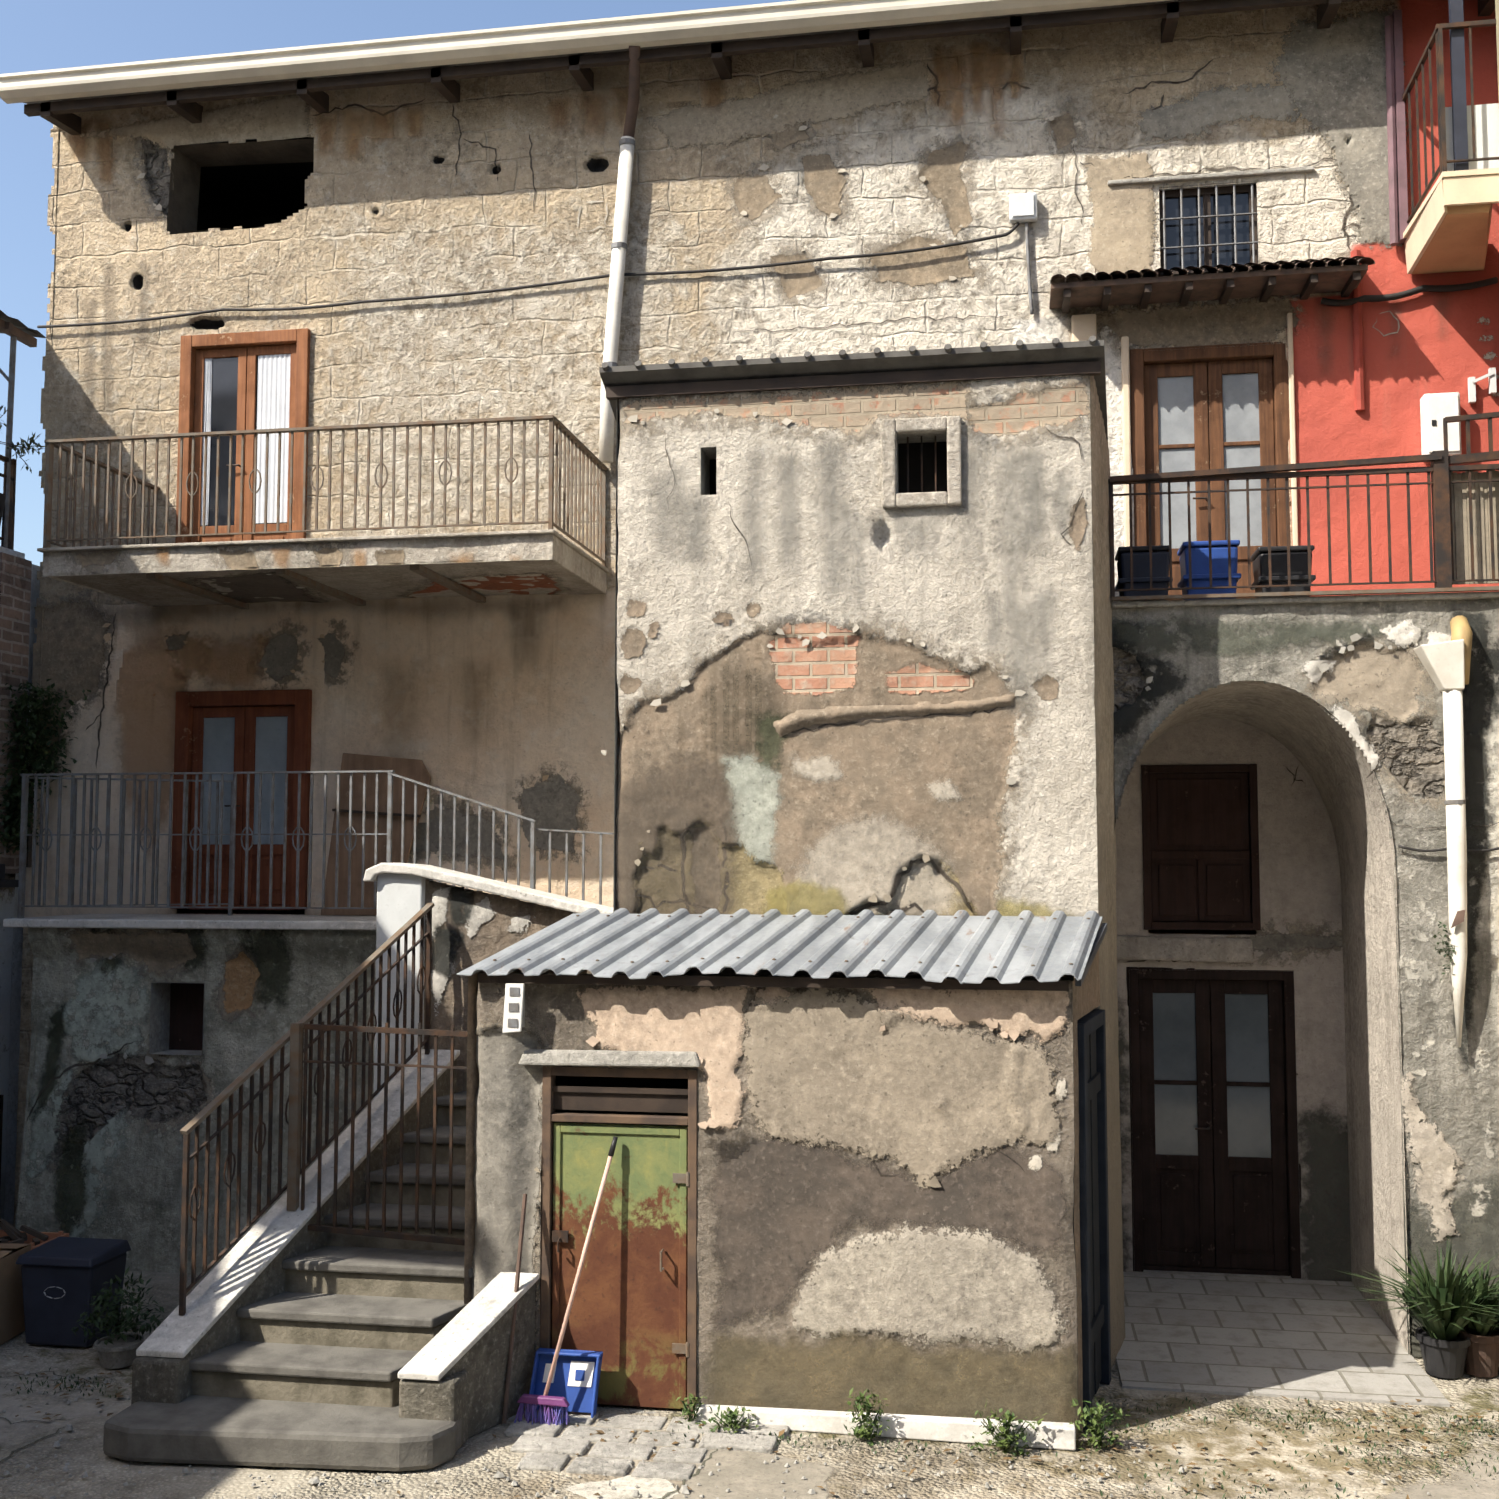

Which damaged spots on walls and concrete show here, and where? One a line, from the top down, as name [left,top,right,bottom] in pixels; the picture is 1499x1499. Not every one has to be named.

crack [1126,59,1213,110]
crack [313,99,536,208]
peeling [765,242,827,304]
peeling [858,135,986,298]
crack [1073,145,1336,223]
crack [1341,194,1360,249]
water stain [1112,617,1379,737]
peeling [601,600,1059,916]
peeling [409,769,585,870]
water stain [33,1005,66,1121]
water stain [53,1121,87,1235]
peeling [1401,1071,1467,1244]